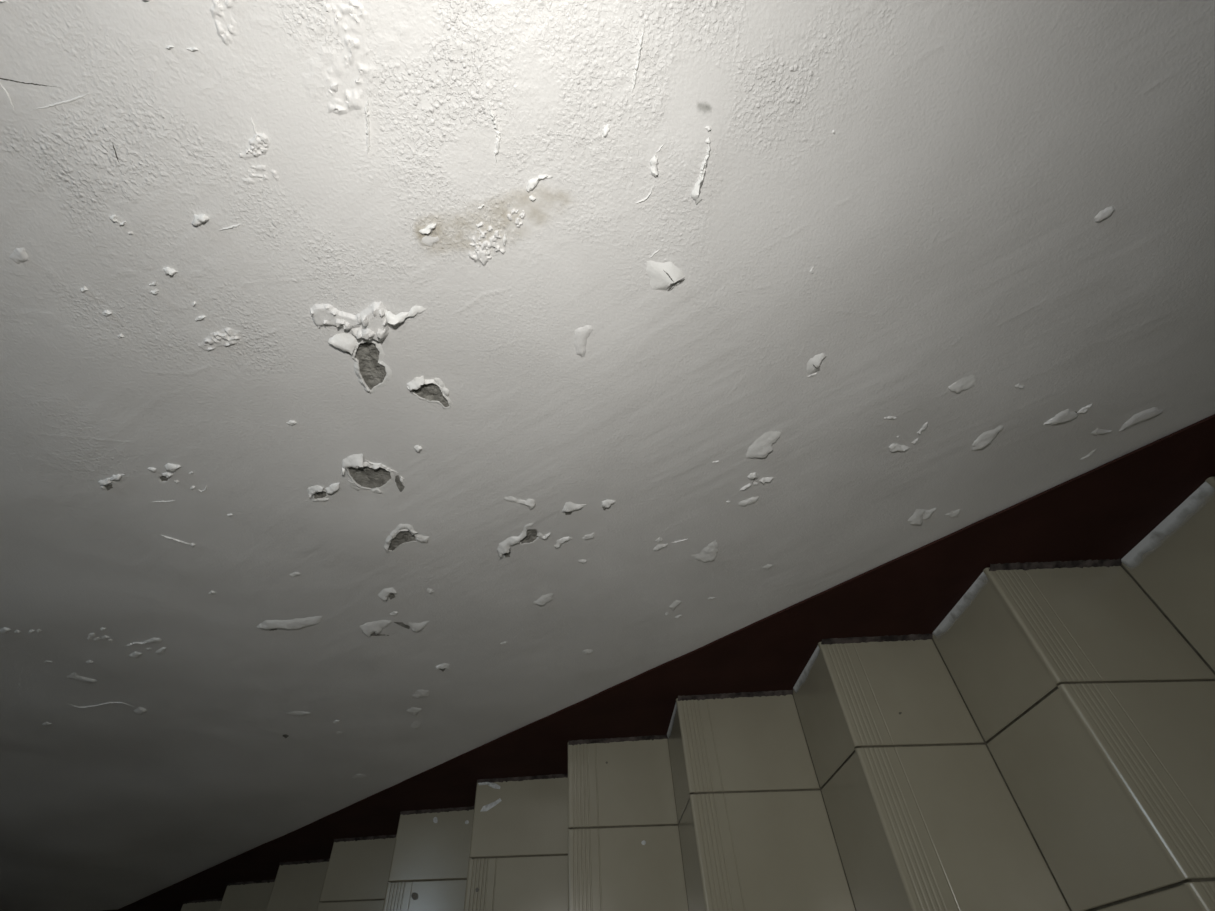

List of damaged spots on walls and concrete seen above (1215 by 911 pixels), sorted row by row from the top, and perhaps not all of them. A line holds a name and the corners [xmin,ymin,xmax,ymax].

spalling [310,301,427,394]
spalling [407,376,452,410]
peeling [1044,404,1092,425]
spalling [307,454,405,502]
peeling [740,430,781,490]
spalling [384,524,429,552]
peeling [497,496,551,559]
peeling [257,616,323,631]
peeling [360,588,430,637]